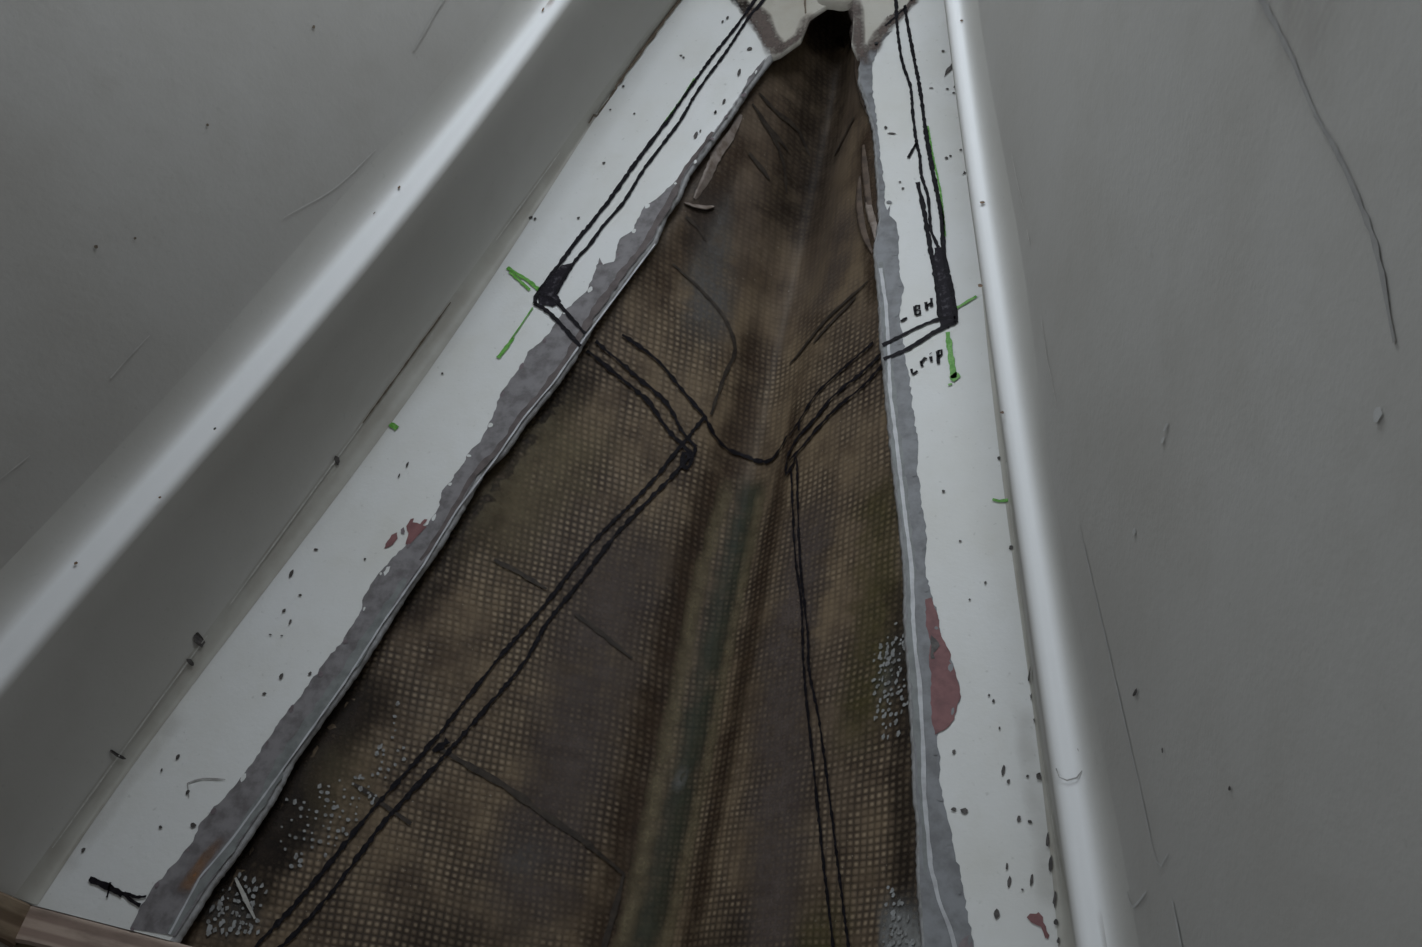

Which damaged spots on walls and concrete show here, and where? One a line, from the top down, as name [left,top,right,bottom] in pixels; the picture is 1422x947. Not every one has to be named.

peeling [130,47,766,936]
peeling [854,31,974,947]
peeling [1006,833,1053,891]
peeling [1027,891,1060,943]